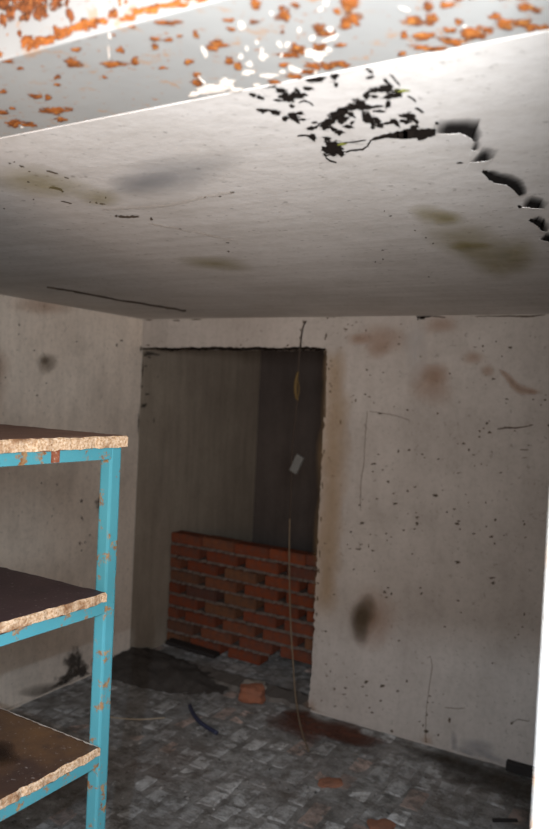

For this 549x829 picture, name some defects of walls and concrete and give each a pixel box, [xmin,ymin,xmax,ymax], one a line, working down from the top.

spalling [238,27,424,163]
crack [343,122,549,247]
damp [42,648,93,694]